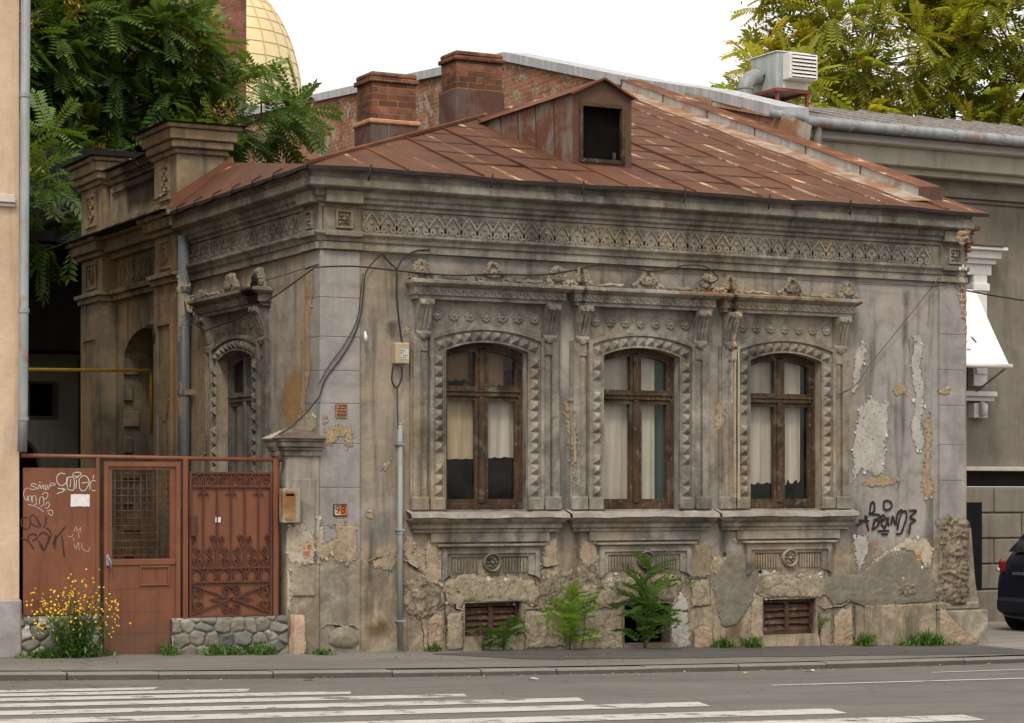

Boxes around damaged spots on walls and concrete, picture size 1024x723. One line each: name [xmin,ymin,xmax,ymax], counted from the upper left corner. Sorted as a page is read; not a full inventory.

peeling [260,431,284,488]
peeling [296,267,354,450]
peeling [851,331,951,502]
spalling [286,510,726,651]
spalling [749,569,825,641]
flaking render [818,606,854,646]
spalling [853,514,977,645]